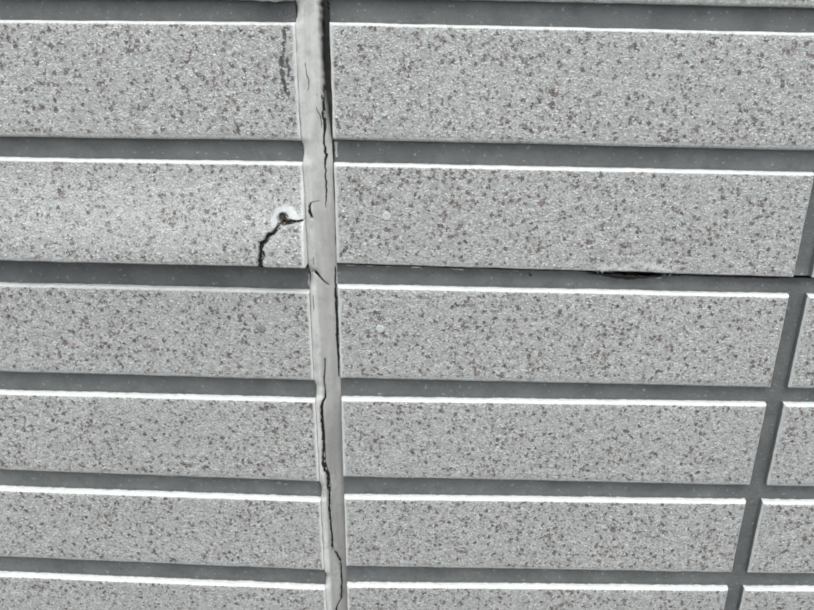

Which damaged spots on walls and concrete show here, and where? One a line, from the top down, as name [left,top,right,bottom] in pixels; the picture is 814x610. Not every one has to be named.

crack [257,200,320,267]
crack [320,358,343,610]